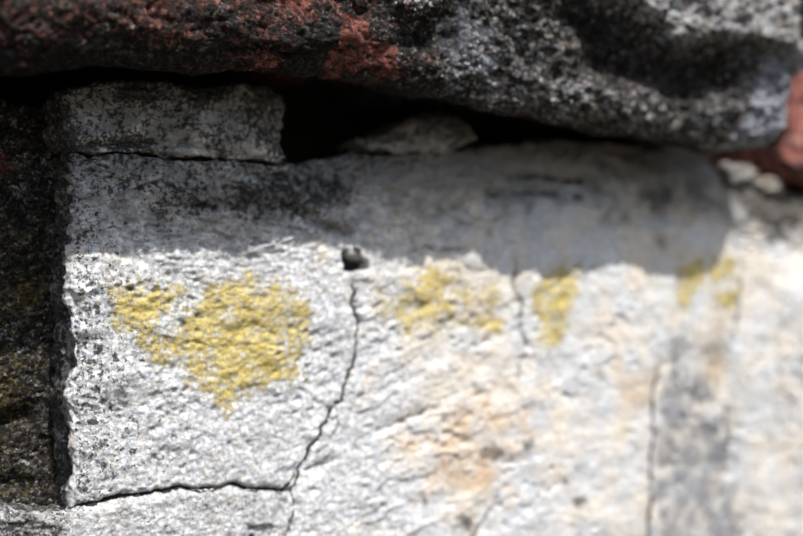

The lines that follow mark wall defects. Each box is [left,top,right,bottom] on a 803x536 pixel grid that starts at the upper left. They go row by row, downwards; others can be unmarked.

crack [61,271,359,536]